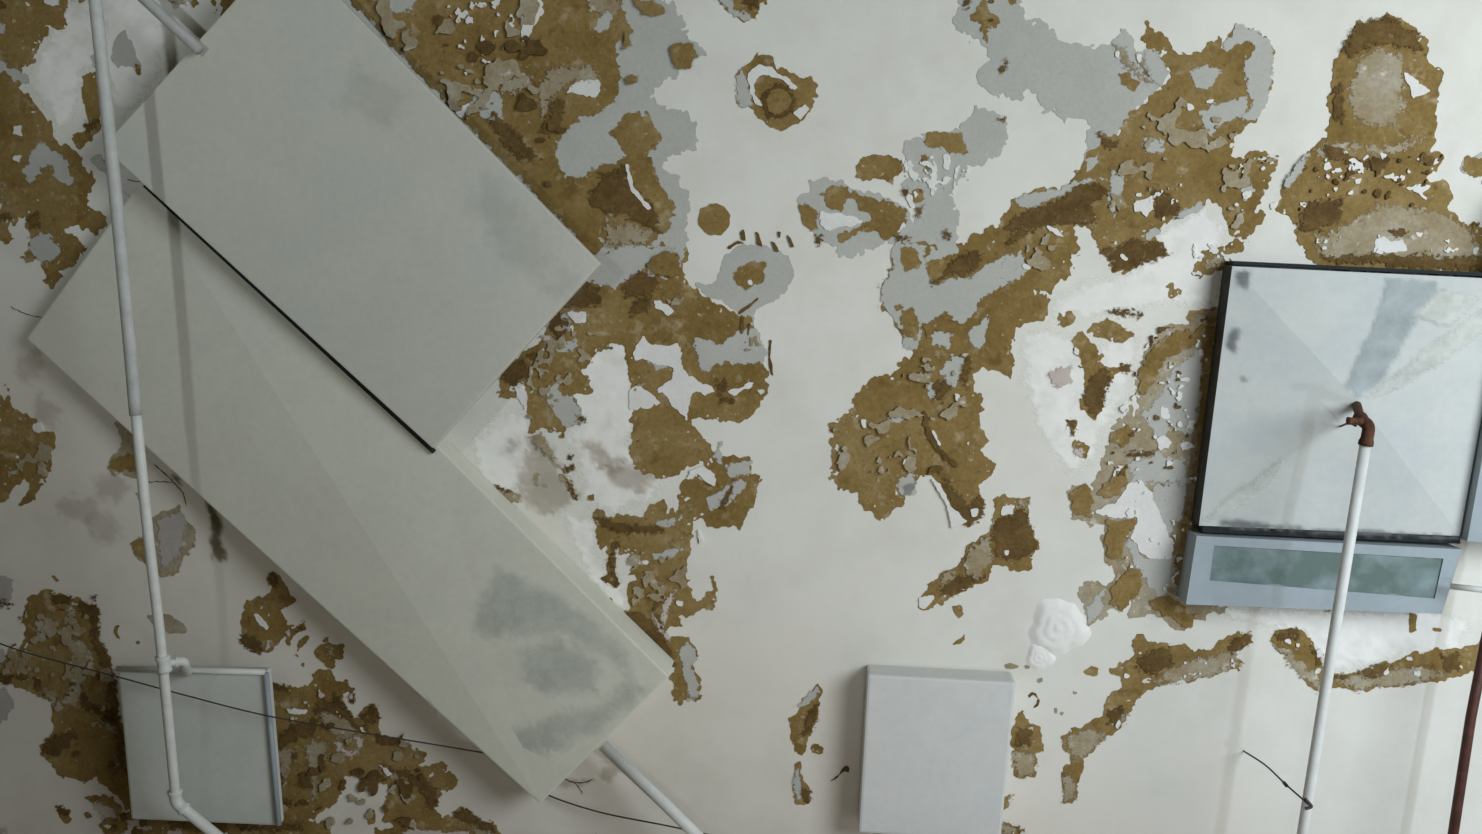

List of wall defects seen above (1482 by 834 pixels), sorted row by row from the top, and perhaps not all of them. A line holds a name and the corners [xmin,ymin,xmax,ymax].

peeling [170,0,235,16]
peeling [0,0,142,289]
flaking render [735,52,819,131]
peeling [351,0,794,706]
peeling [0,385,56,506]
peeling [107,421,139,499]
peeling [797,0,1482,834]
peeling [130,504,196,577]
peeling [0,571,501,834]
peeling [788,684,824,805]